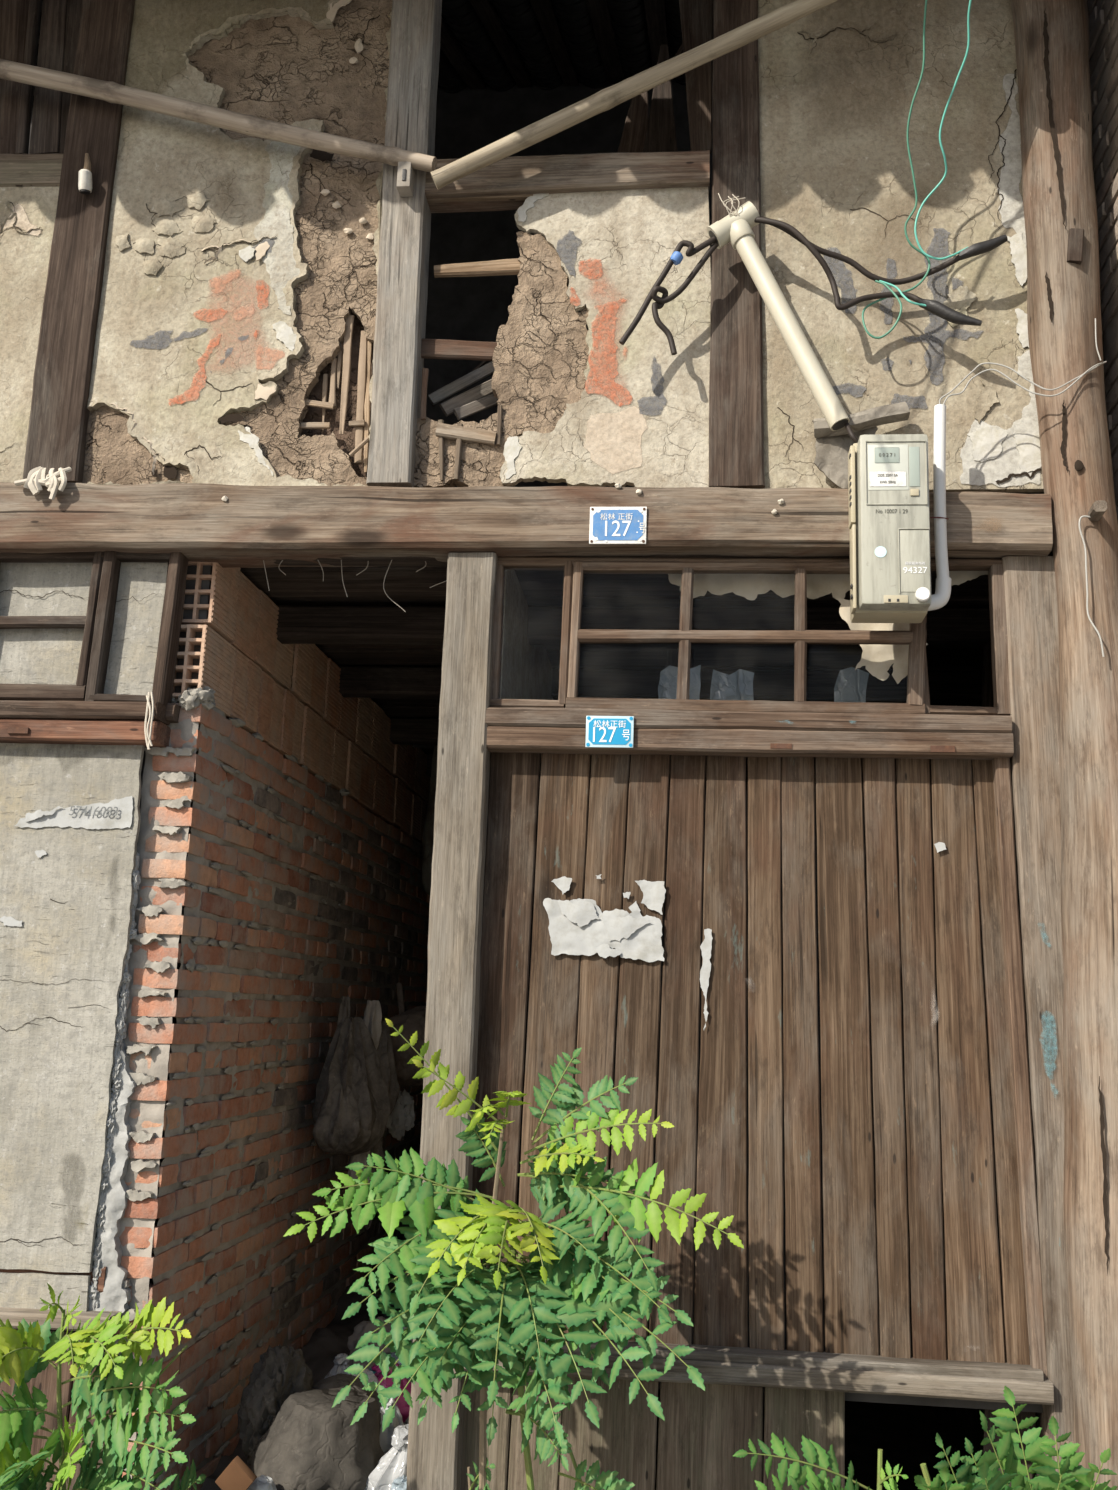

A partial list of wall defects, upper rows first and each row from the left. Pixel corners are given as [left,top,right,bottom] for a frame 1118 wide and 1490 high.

spalling [82,406,193,485]
crack [133,196,276,264]
spalling [188,0,393,486]
spalling [414,193,589,488]
peeling [960,308,1041,487]
peeling [997,74,1027,286]
crack [1045,272,1054,323]
crack [0,979,116,1032]
spalling [89,852,141,1311]
crack [0,1236,79,1247]